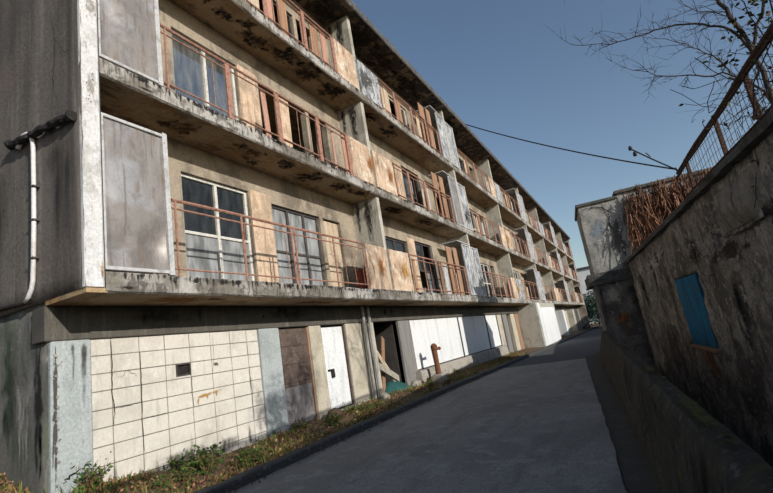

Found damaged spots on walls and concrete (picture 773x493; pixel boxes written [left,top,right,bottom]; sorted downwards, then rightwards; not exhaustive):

damp [328,22,344,45]
crack [584,207,614,245]
crack [709,210,771,267]
damp [3,354,44,472]